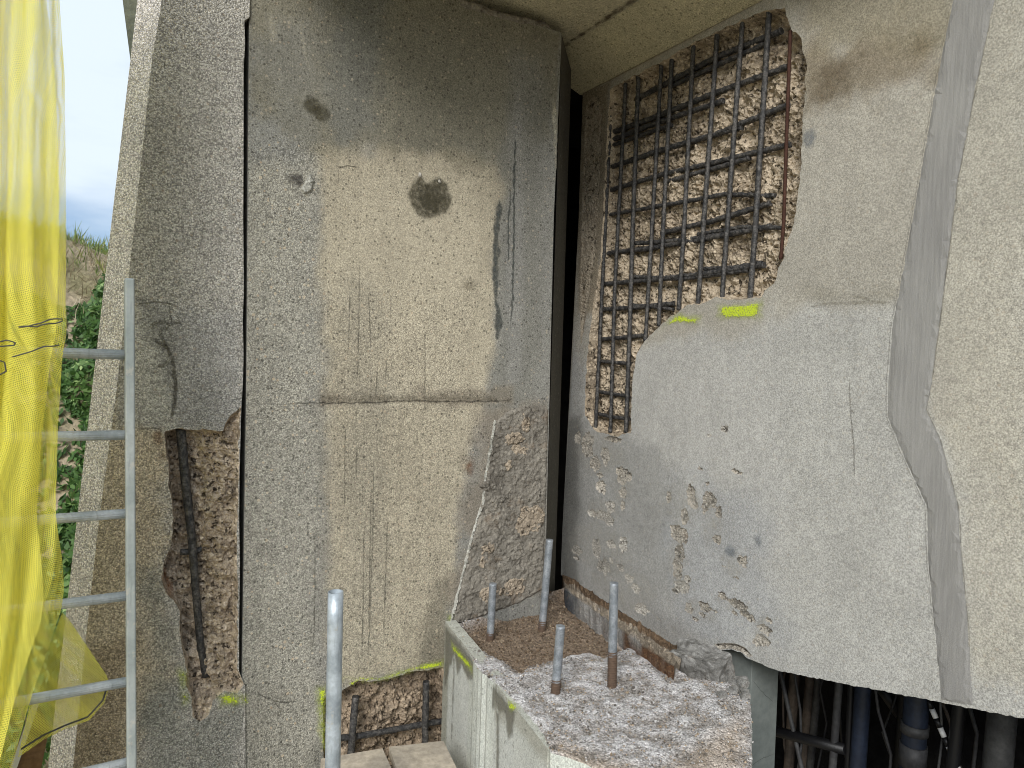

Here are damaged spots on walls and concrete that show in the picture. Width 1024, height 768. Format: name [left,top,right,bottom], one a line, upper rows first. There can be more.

crack [156,301,177,430]
leakage [305,99,327,119]
leakage [409,172,450,217]
leakage [493,141,516,339]
spalling [572,8,807,615]
spalling [161,406,244,722]
spalling [670,466,773,657]
spalling [341,667,444,768]